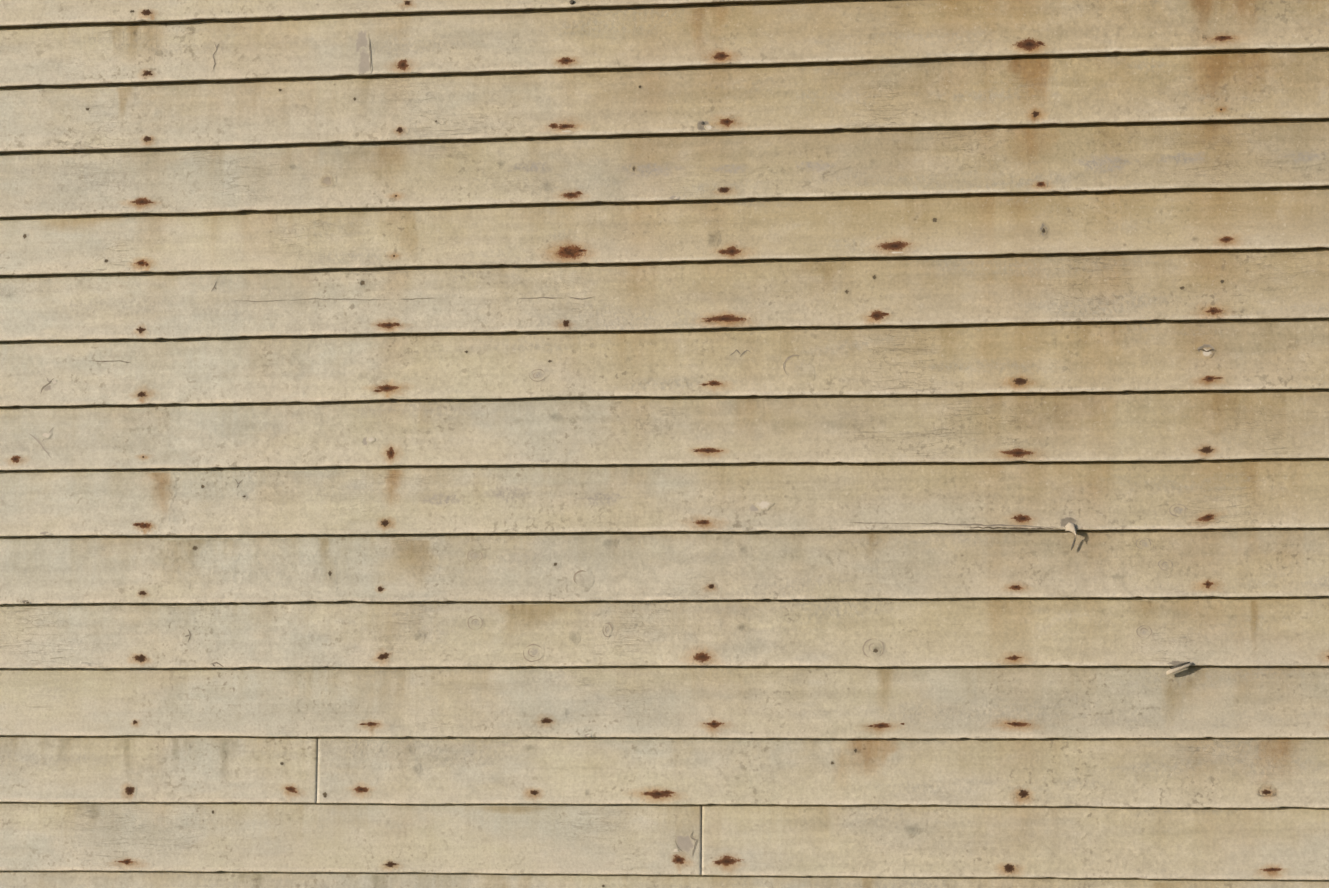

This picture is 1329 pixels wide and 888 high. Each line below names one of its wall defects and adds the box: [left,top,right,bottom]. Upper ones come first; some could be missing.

corrosion [1183,0,1289,115]
corrosion [1004,35,1064,191]
corrosion [115,195,166,212]
corrosion [534,235,602,263]
corrosion [864,234,923,256]
corrosion [686,309,762,328]
corrosion [856,306,896,325]
corrosion [358,377,419,399]
corrosion [985,446,1053,461]
corrosion [1248,738,1310,803]
corrosion [621,784,692,804]
corrosion [666,849,750,875]